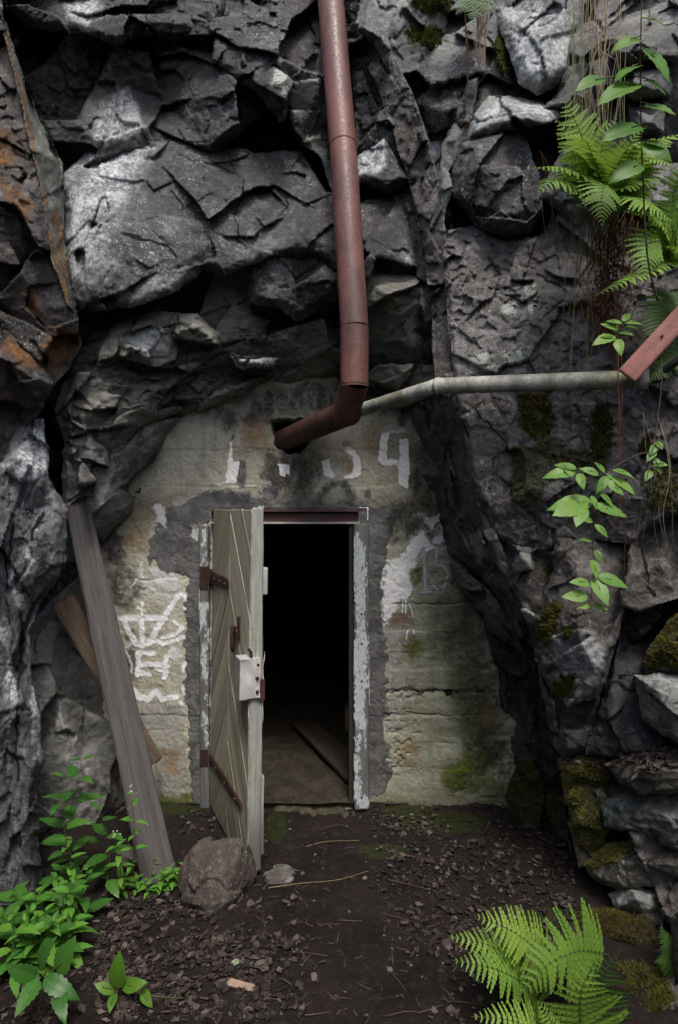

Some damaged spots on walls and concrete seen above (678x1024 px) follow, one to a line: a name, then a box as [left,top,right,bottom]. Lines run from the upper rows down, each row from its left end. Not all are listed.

leakage [261,452,322,496]
flaking render [153,484,223,529]
peeling [191,525,209,566]
peeling [149,568,182,593]
peeling [199,601,209,747]
peeling [354,511,448,808]
crack [389,686,488,770]